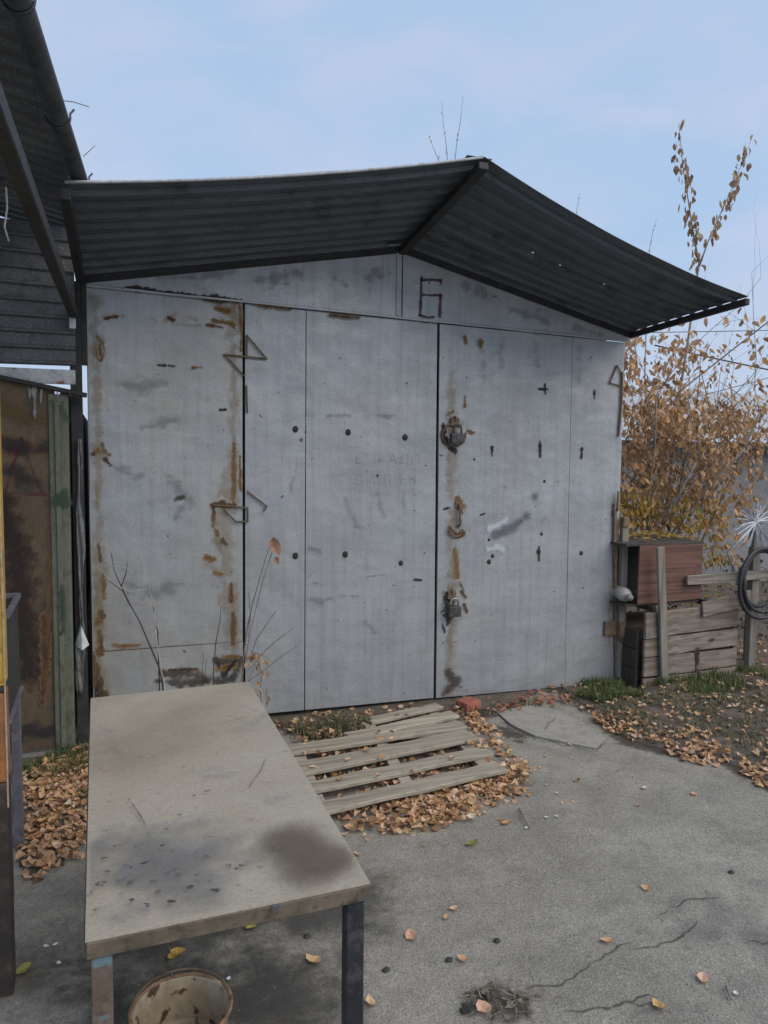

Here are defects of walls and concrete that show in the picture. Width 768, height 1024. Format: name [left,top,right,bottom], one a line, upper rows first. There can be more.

corrosion [95,335,106,362]
corrosion [125,285,292,352]
corrosion [91,442,111,465]
corrosion [210,442,243,545]
corrosion [442,396,467,454]
corrosion [3,487,53,707]
corrosion [155,554,243,689]
corrosion [441,526,468,626]